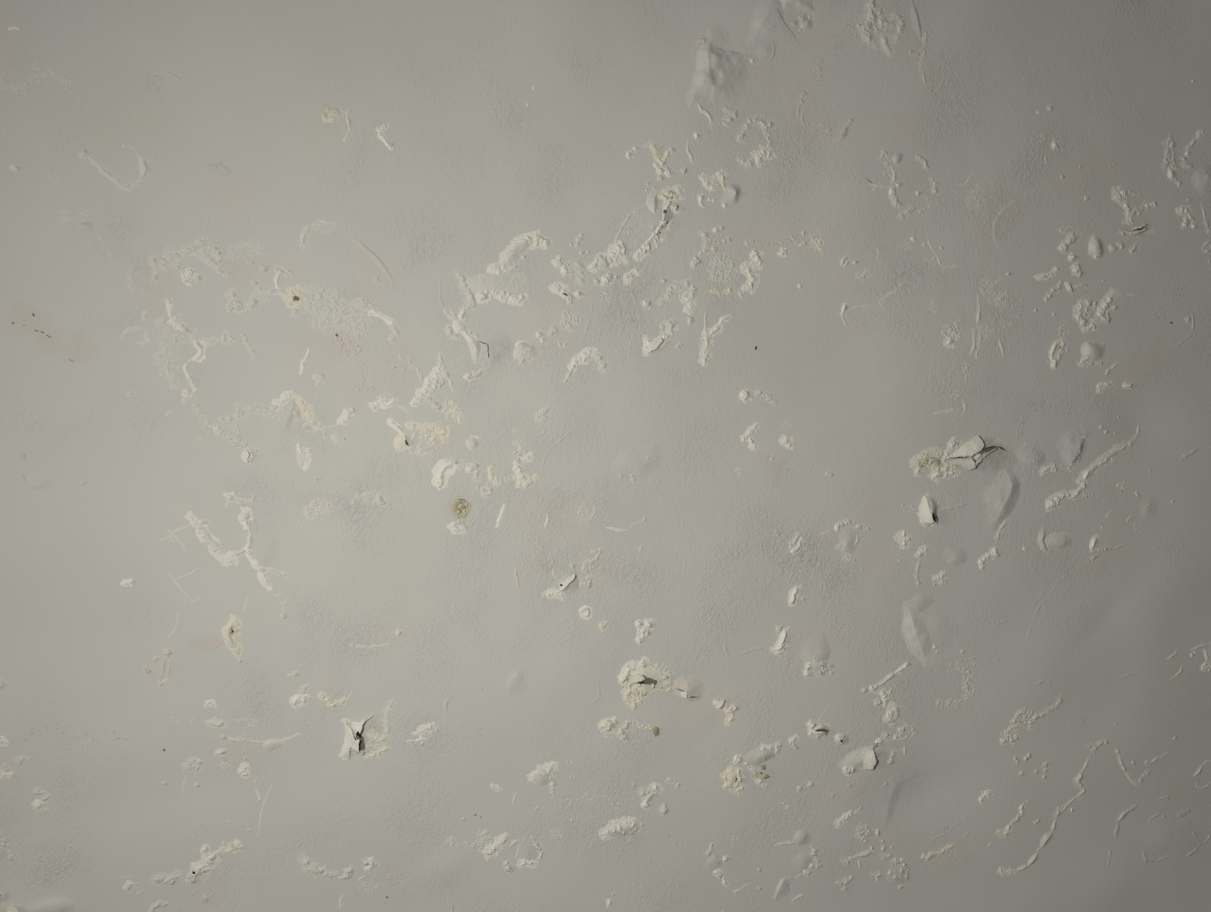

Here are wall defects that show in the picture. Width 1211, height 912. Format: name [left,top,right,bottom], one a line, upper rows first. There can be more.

peeling [642,316,679,357]
peeling [368,391,410,452]
peeling [918,495,936,524]
peeling [617,656,677,711]
peeling [339,698,447,761]